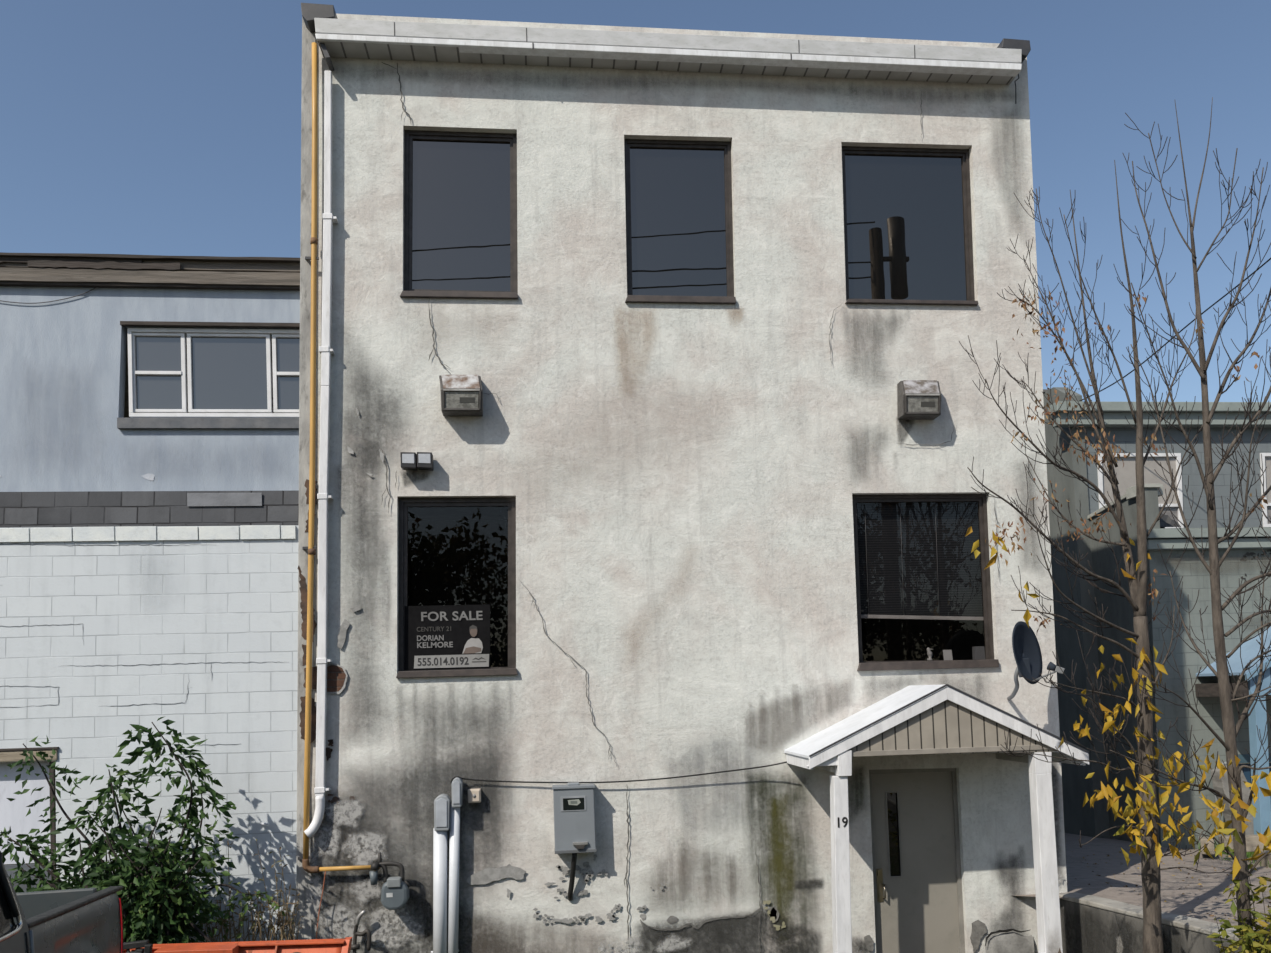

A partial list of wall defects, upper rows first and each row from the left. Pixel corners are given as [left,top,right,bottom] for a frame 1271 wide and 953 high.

crack [382,62,411,122]
crack [429,298,451,374]
damp [354,375,395,572]
peeling [309,794,422,948]
damp [320,714,517,953]
crack [520,581,630,953]
peeling [545,854,608,899]
peeling [533,904,621,924]
flaking render [598,900,786,953]
damp [640,779,822,953]